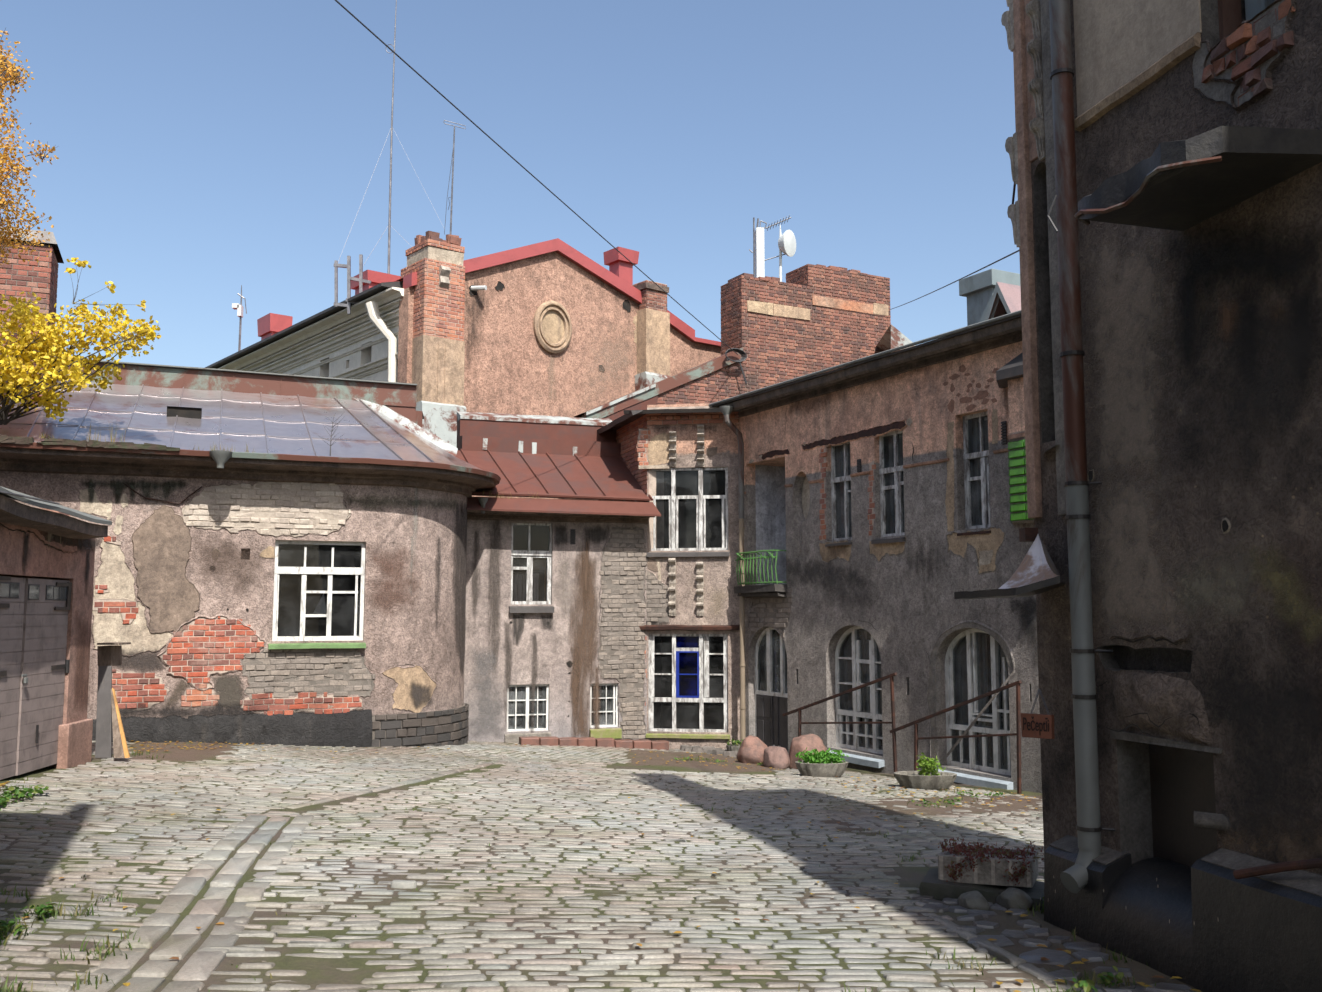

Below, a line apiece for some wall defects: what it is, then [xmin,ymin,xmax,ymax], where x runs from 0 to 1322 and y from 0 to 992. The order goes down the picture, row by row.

flaking render [1190,0,1297,111]
damp [115,483,171,503]
spalling [943,365,1006,574]
flaking render [78,481,437,715]
damp [571,538,600,737]